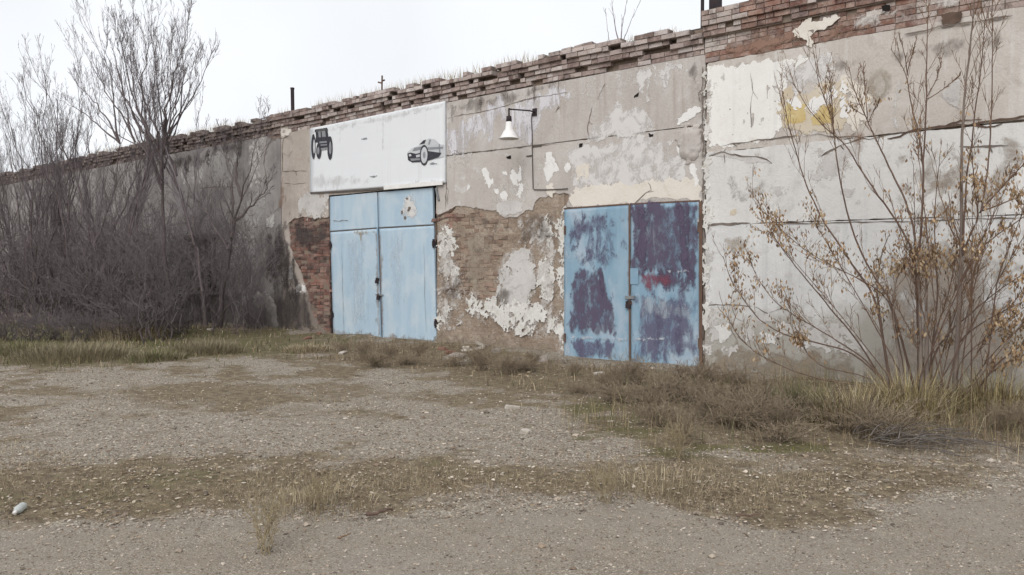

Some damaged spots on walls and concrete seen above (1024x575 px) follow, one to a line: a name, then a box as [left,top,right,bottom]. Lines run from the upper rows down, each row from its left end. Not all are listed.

spalling [288,191,332,333]
peeling [401,195,417,221]
spalling [431,5,896,362]
crack [698,68,1024,345]